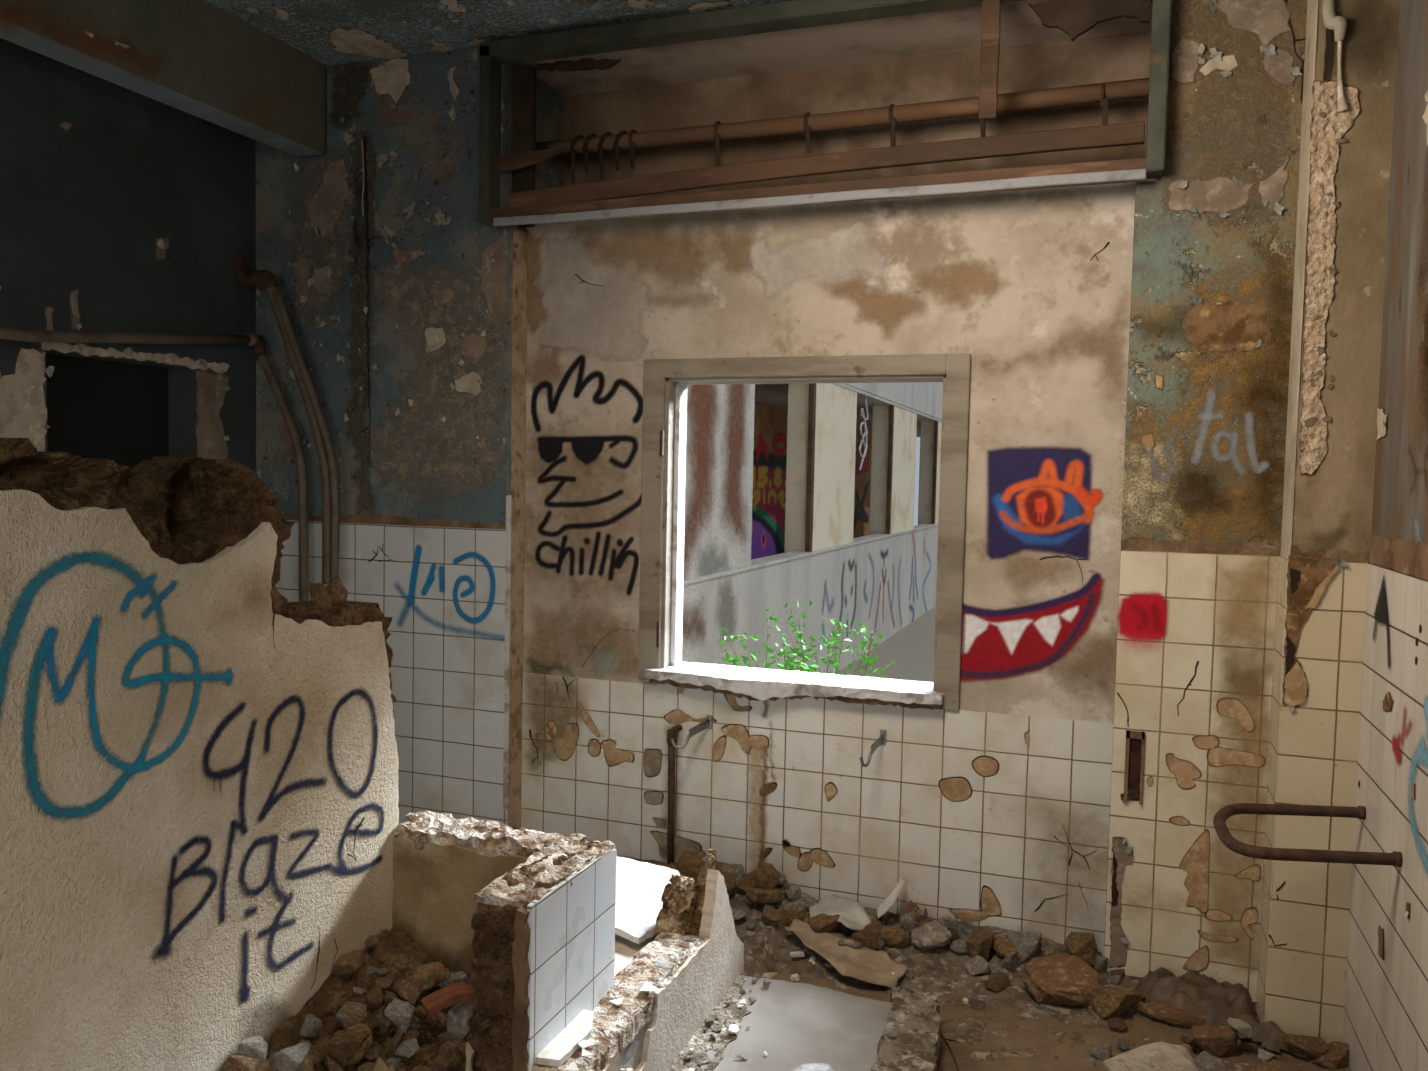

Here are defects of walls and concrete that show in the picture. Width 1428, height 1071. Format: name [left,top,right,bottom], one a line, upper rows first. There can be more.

water stain [527,236,548,331]
water stain [588,233,751,278]
water stain [832,266,998,332]
peeling [1115,0,1360,545]
water stain [1248,253,1291,513]
spalling [1282,555,1347,711]
spalling [546,703,702,862]
spalling [664,694,769,762]
spalling [939,755,999,802]
spalling [1166,735,1266,790]
spalling [1109,837,1134,968]
spalling [1169,816,1261,972]